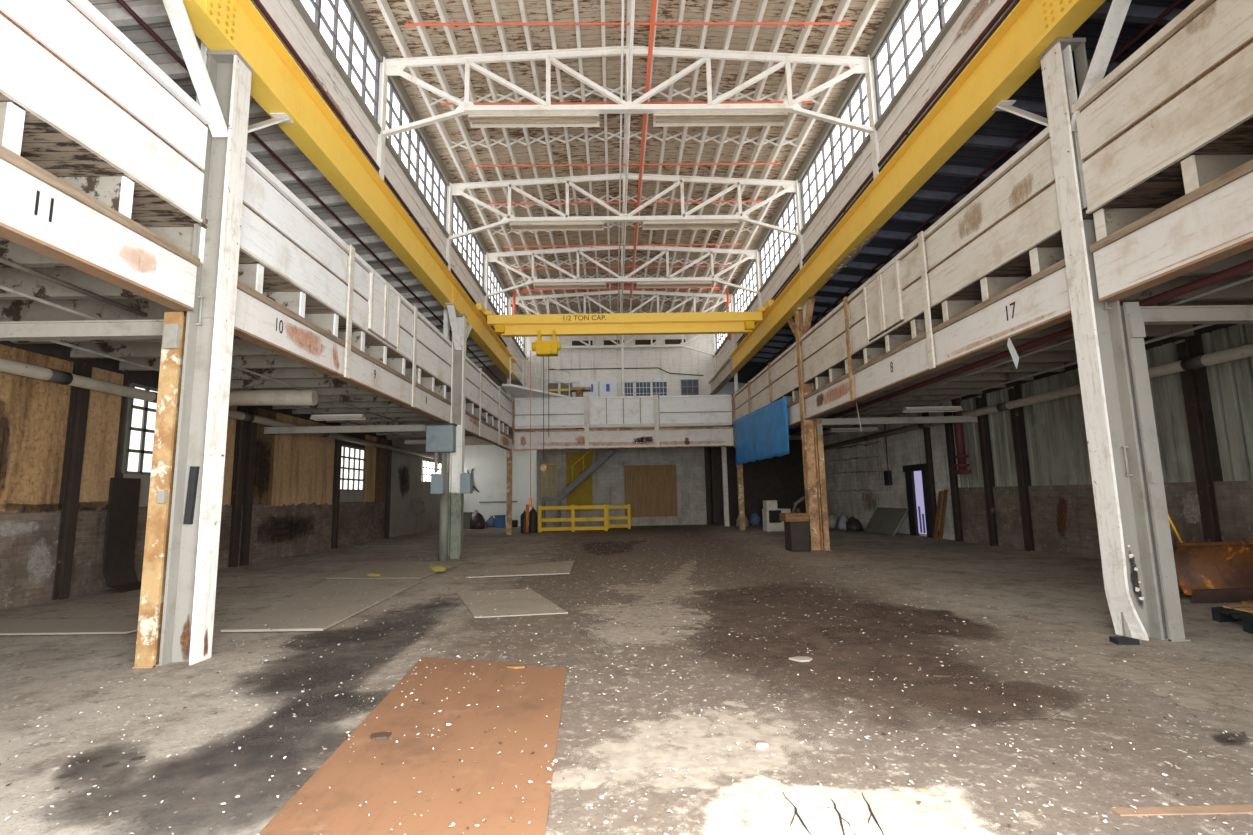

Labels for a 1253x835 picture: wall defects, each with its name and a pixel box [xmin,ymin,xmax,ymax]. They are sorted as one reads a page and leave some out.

corrosion [289,327,317,352]
damp [0,417,9,481]